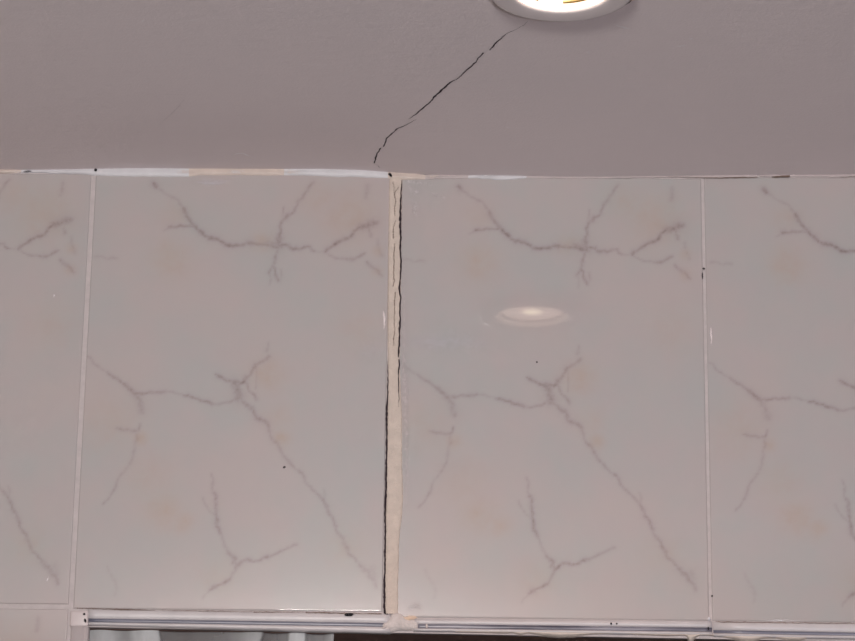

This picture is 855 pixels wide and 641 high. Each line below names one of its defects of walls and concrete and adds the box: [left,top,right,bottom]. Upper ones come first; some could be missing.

crack [374,22,527,163]